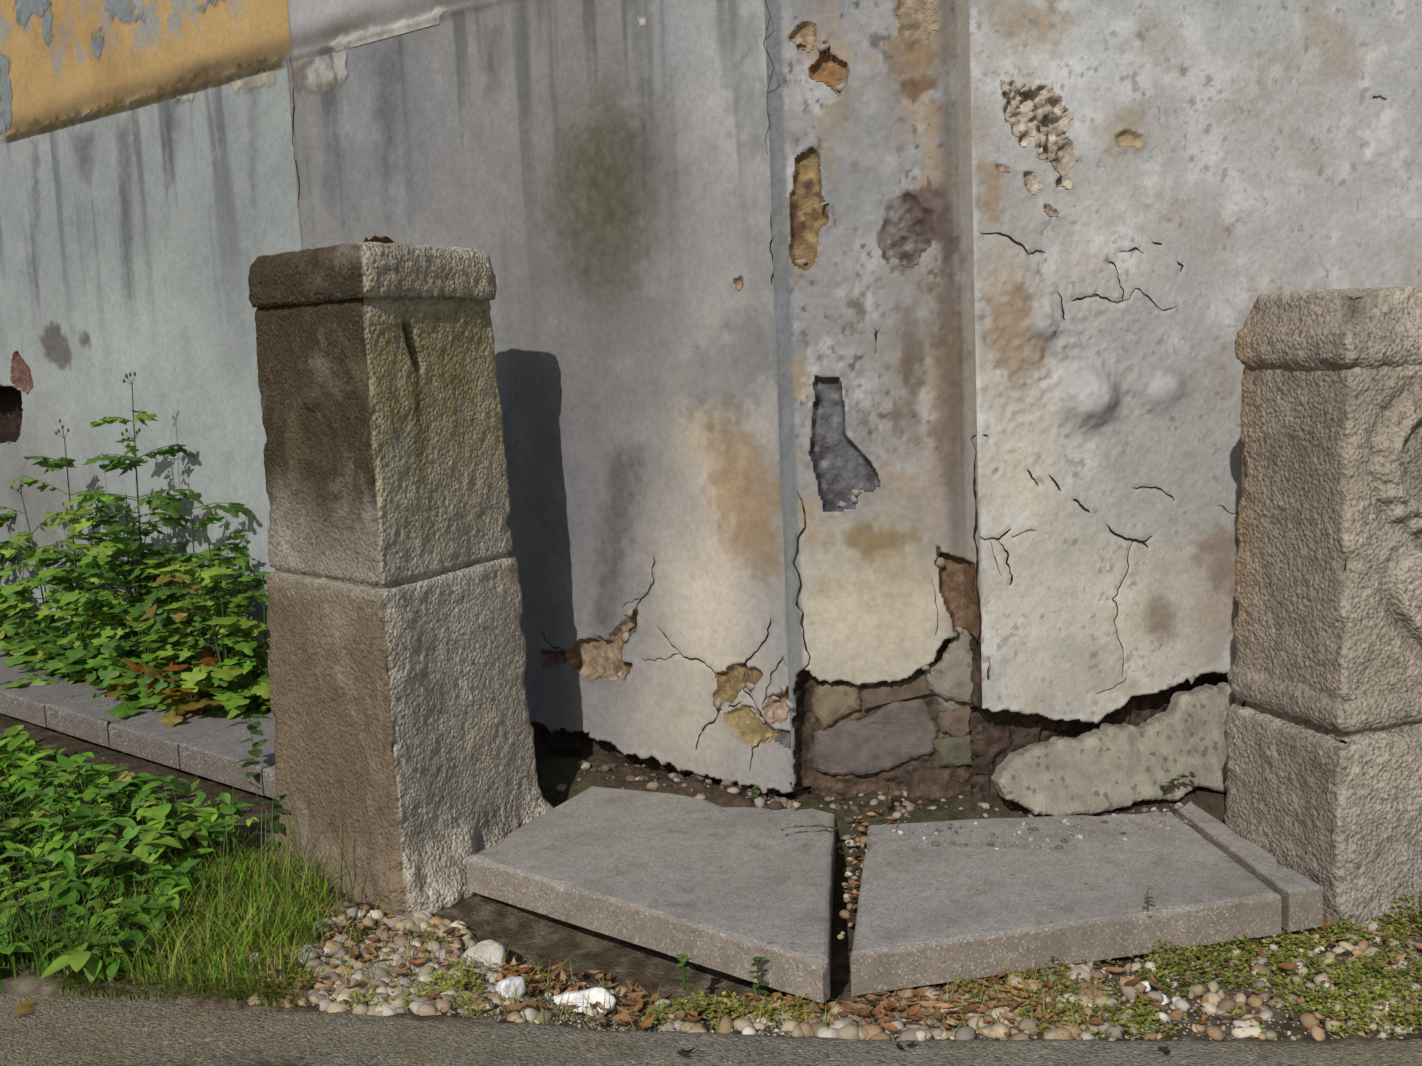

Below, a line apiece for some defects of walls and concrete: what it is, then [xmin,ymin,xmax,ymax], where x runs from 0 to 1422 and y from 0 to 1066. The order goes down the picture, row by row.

water stain [291,55,338,93]
flaking render [788,21,850,95]
flaking render [789,147,829,270]
crack [980,232,1044,254]
flaking render [995,80,1078,216]
crack [1058,241,1184,320]
spalling [0,351,33,444]
flaking render [809,375,880,511]
crack [623,490,811,771]
flaking render [530,546,1228,804]
crack [971,434,1034,679]
crack [1027,469,1152,694]